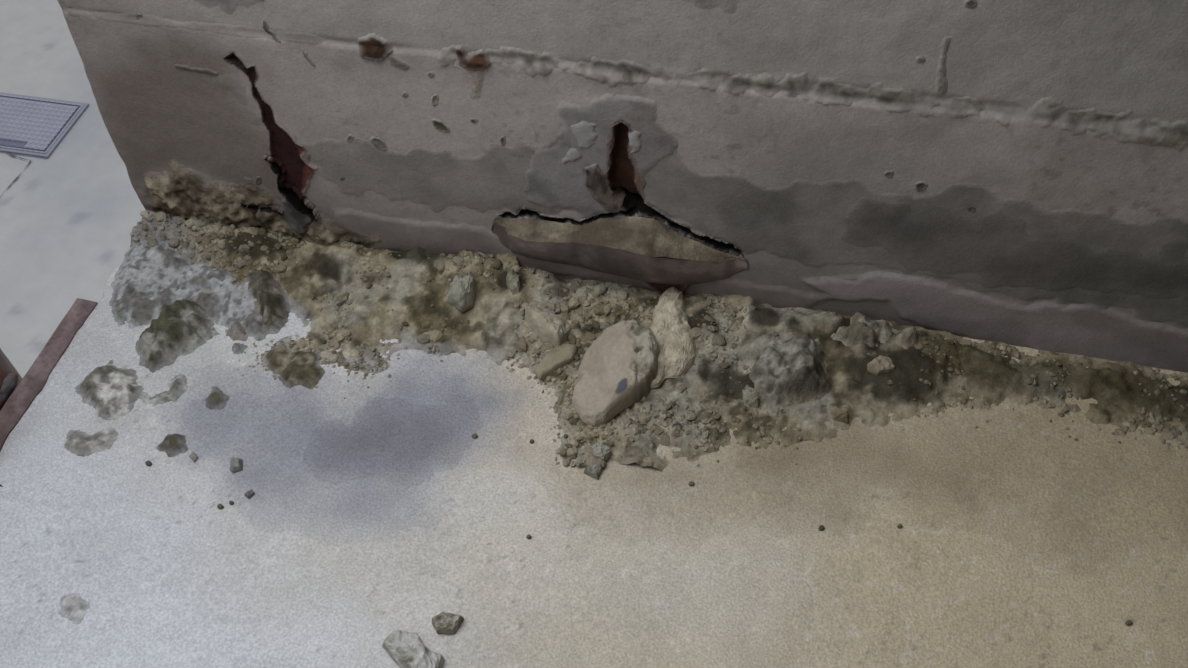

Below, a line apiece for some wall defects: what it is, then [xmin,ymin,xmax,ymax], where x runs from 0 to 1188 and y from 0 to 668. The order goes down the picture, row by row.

crack [261,0,316,67]
corrosion [357,33,410,71]
corrosion [455,45,490,99]
crack [174,49,321,234]
spalling [142,159,382,250]
water stain [292,131,655,290]
spalling [584,116,646,213]
crack [496,184,745,258]
water stain [643,120,1188,373]
water stain [155,349,536,548]